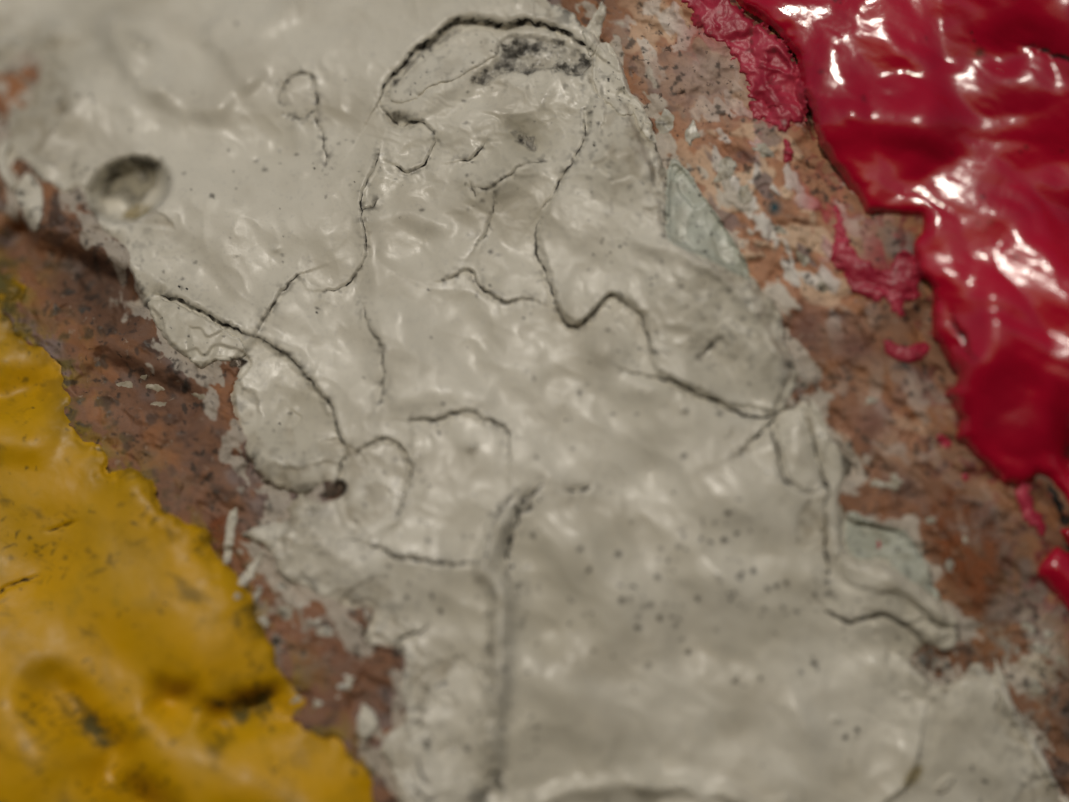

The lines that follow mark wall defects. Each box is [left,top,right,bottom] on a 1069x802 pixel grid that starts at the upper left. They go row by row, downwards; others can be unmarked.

peeling [380,1,700,146]
peeling [0,138,44,234]
crack [359,110,436,247]
peeling [665,156,753,280]
peeling [147,299,247,368]
crack [161,295,349,471]
crack [446,126,830,580]
peeling [222,507,238,567]
crack [340,485,541,566]
peeling [775,399,959,679]
crack [1047,483,1069,550]
crack [825,594,954,652]